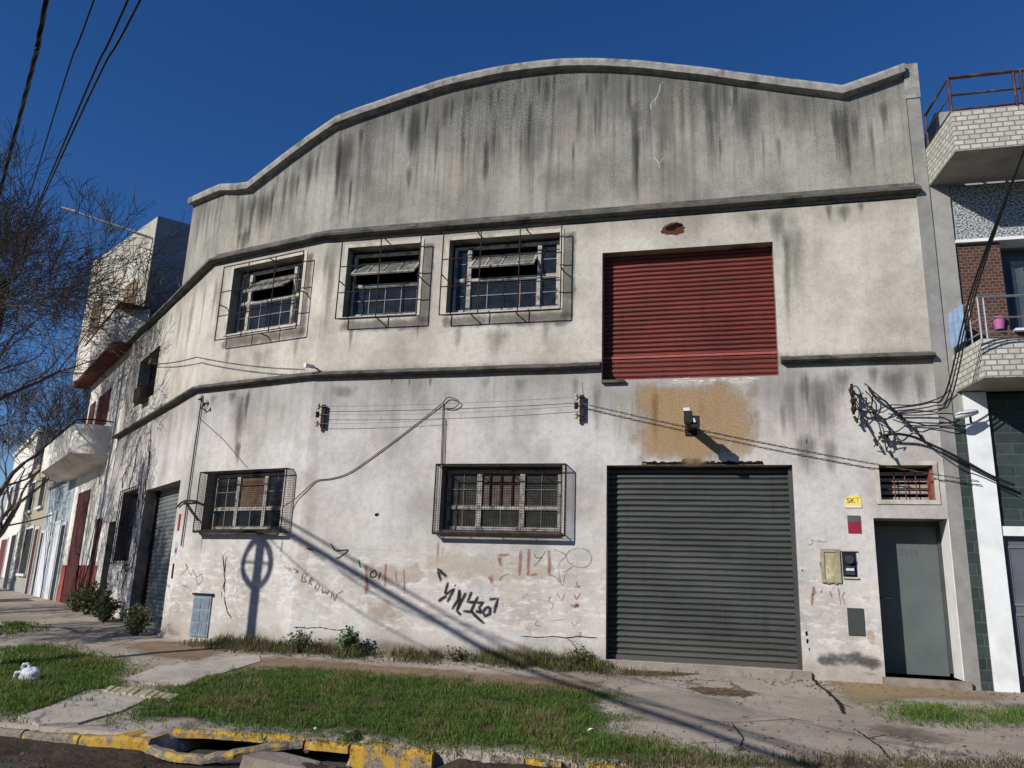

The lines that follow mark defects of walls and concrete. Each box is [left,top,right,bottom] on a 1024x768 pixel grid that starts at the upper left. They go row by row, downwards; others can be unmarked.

flaking render [671,377,759,385]
leakage [819,653,879,669]
crack [814,680,912,758]